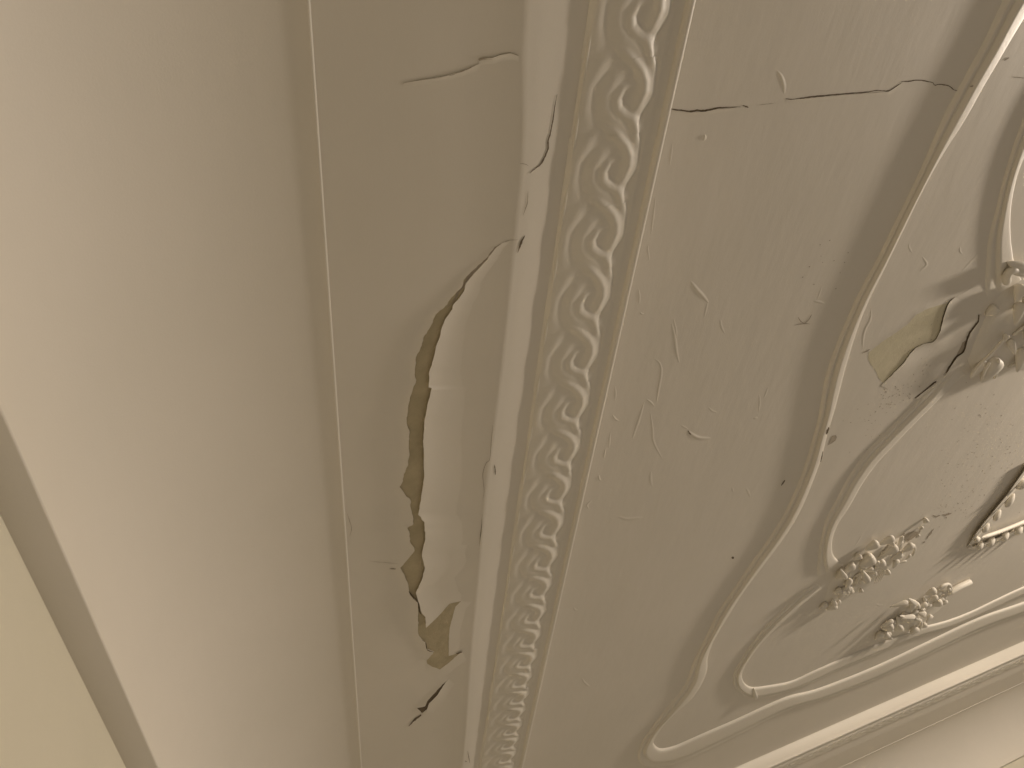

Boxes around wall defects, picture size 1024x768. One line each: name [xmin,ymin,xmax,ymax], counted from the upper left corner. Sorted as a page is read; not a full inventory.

crack [403,53,519,88]
crack [671,80,973,117]
crack [518,96,557,251]
peeling [857,277,982,424]
crack [915,315,985,400]
peeling [370,240,510,678]